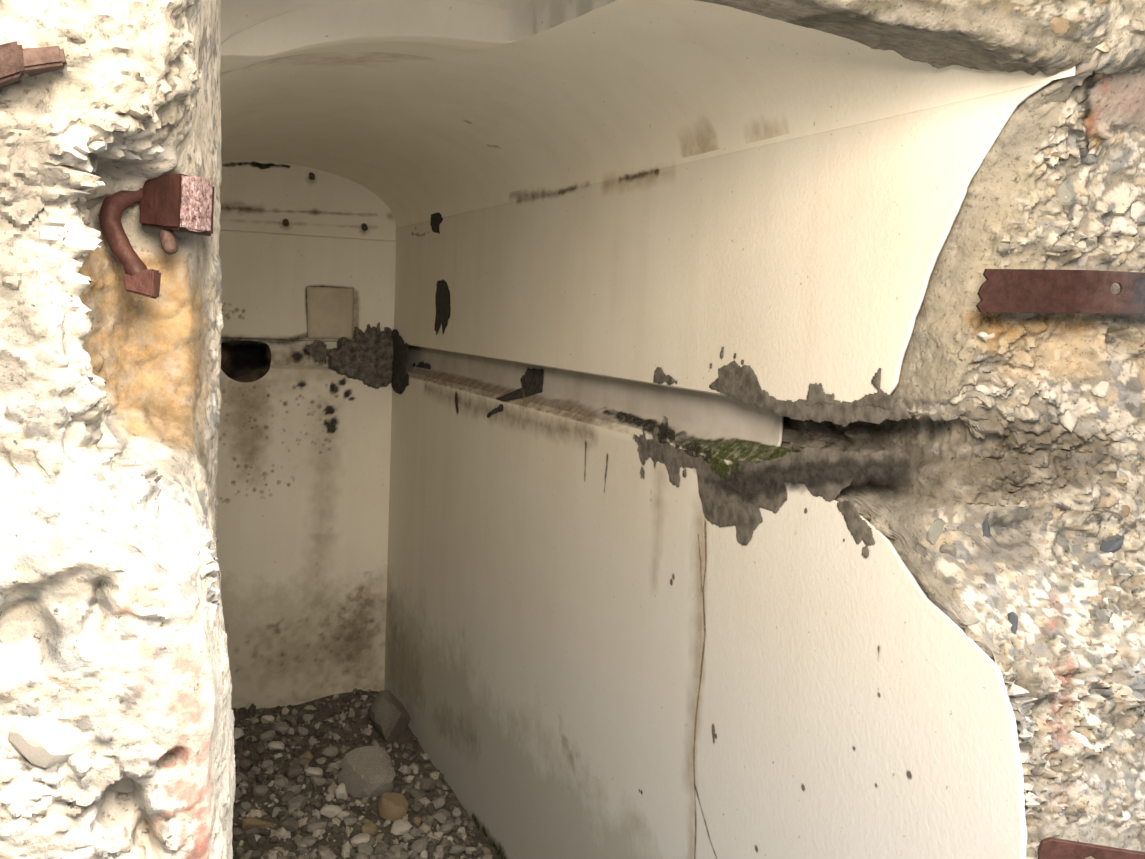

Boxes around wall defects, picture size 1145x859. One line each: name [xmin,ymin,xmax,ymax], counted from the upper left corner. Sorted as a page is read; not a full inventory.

corrosion [81,258,204,454]
damp [221,286,343,364]
damp [324,379,354,433]
peeling [354,322,431,394]
peeling [653,367,677,385]
peeling [709,347,911,427]
flaking render [634,435,910,558]